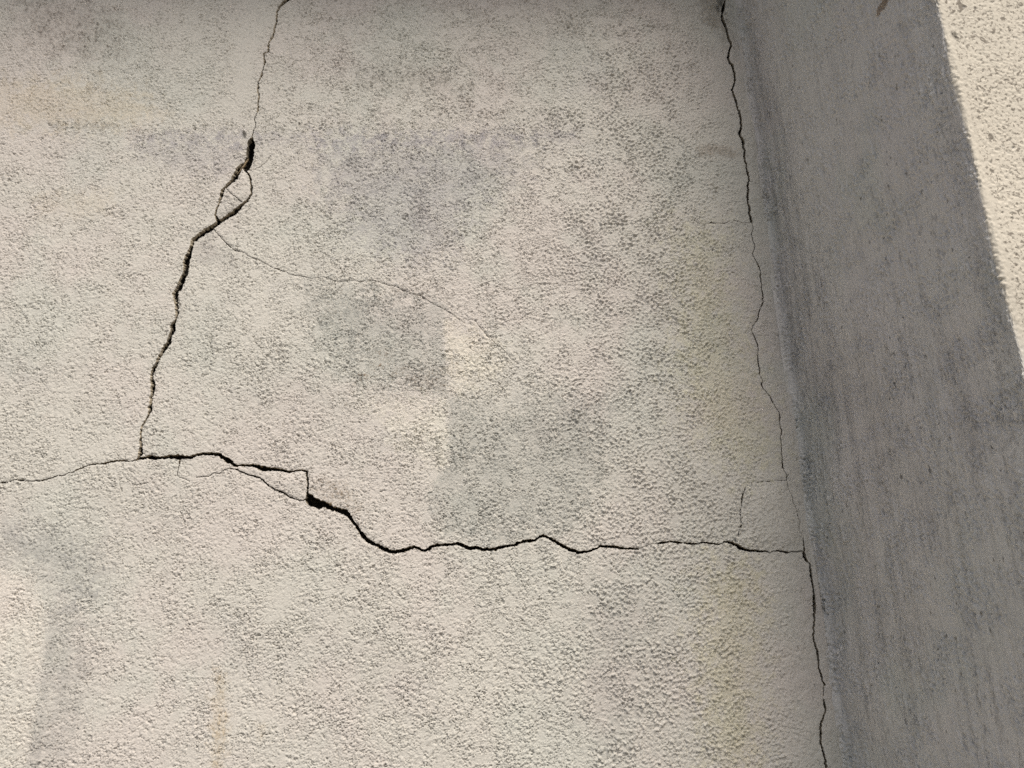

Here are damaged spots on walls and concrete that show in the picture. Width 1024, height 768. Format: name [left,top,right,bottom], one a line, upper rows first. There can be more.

crack [1,0,518,502]
crack [328,0,828,768]